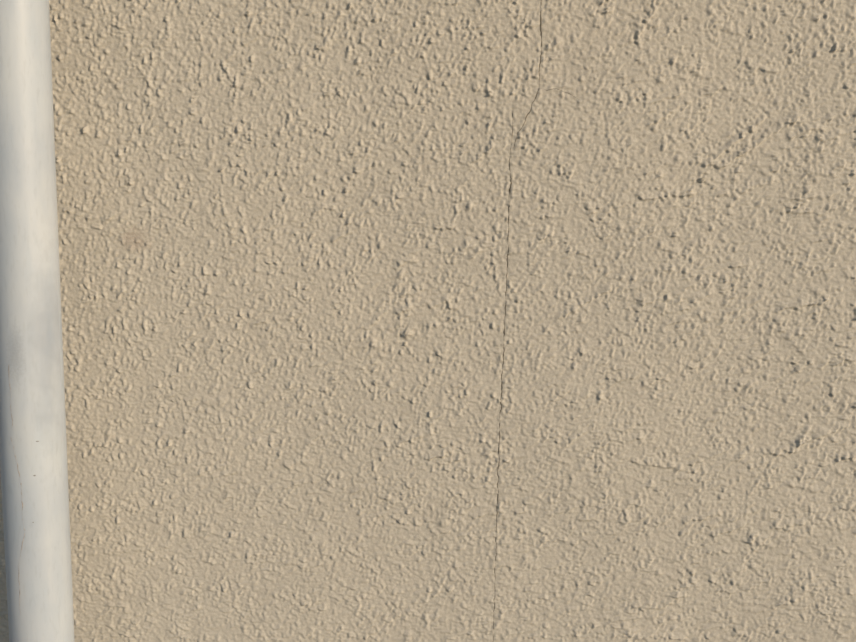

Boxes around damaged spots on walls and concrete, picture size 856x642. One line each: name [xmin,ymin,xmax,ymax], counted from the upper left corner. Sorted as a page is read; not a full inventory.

crack [493,0,574,641]